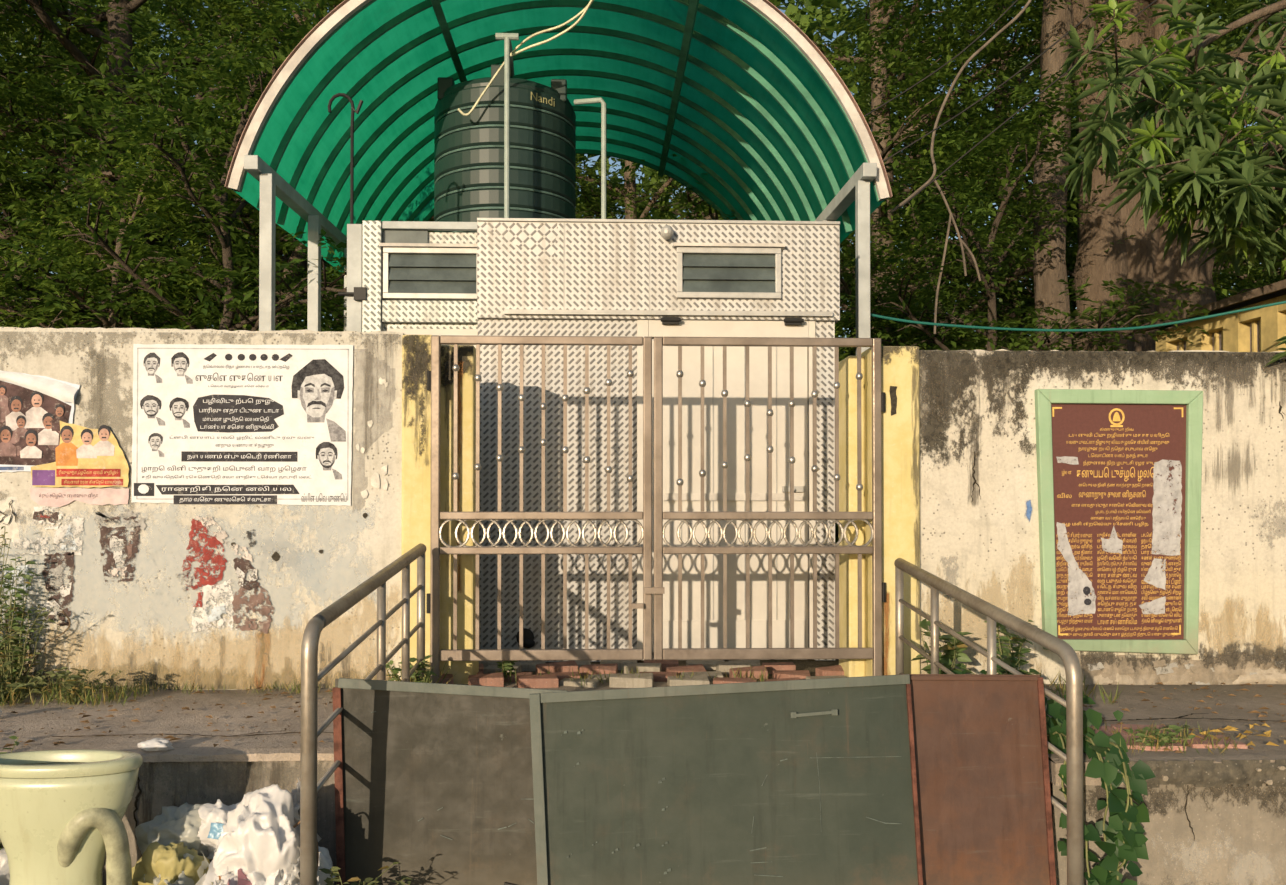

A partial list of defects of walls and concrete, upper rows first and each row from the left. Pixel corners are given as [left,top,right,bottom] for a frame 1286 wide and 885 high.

leakage [402,335,473,592]
crack [968,415,981,504]
leakage [881,346,1286,466]